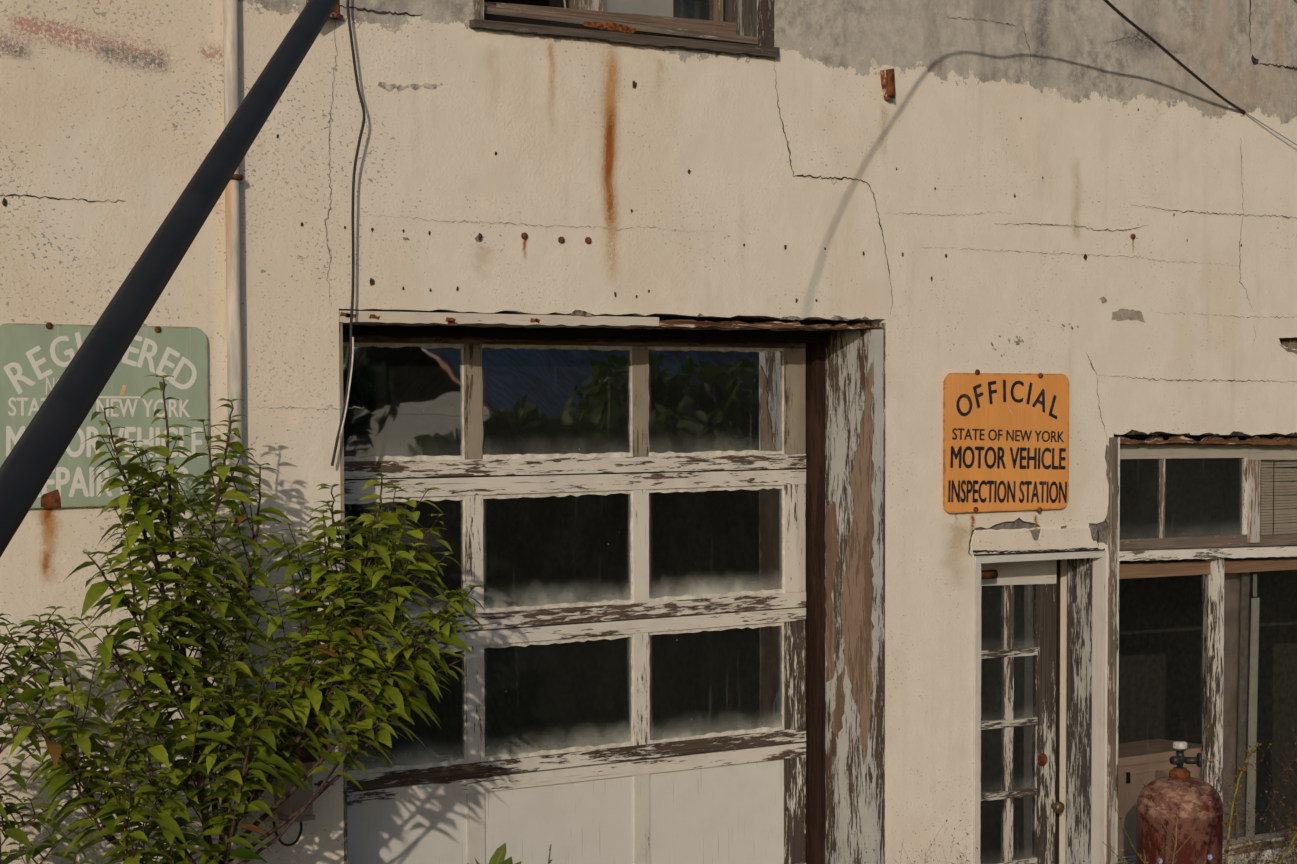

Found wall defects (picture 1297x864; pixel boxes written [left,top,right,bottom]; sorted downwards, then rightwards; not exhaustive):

corrosion [603,55,617,241]
crack [0,194,122,203]
crack [774,58,1297,344]
spalling [1279,337,1297,354]
crack [1086,353,1296,437]
corrosion [41,508,57,570]
peeling [824,363,874,765]